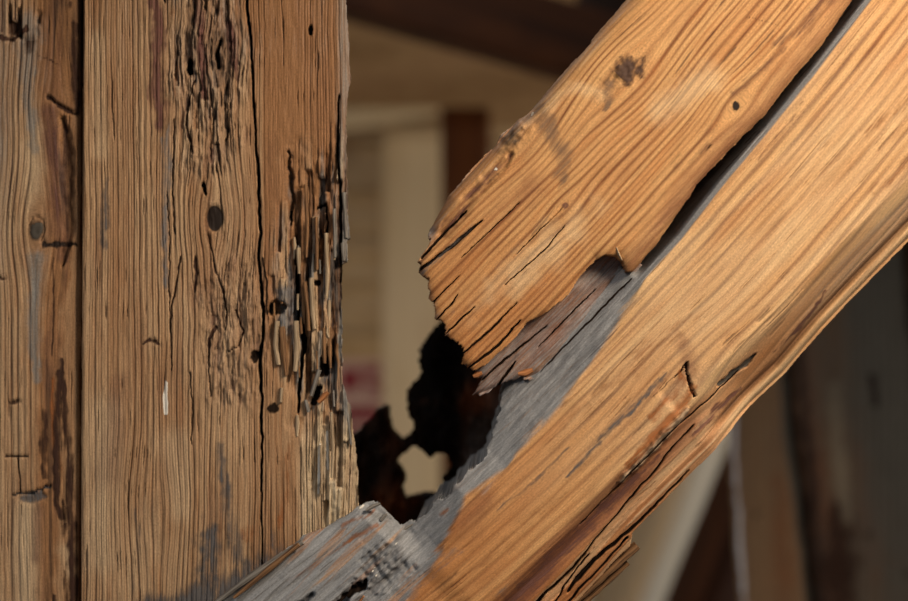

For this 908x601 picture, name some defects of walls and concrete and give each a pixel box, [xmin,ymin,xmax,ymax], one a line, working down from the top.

crack [246,0,269,553]
peeling [272,184,348,494]
crack [419,203,519,334]
crack [463,222,632,386]
crack [536,362,737,601]